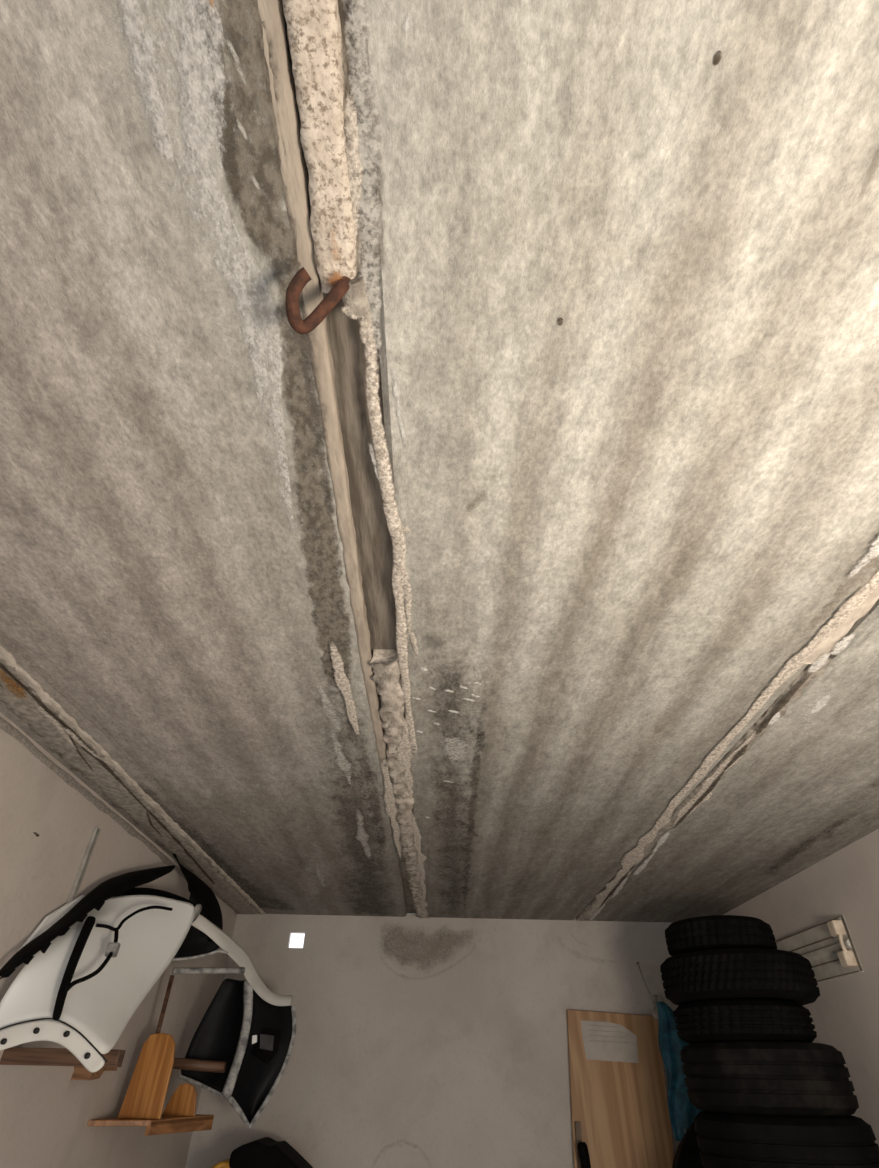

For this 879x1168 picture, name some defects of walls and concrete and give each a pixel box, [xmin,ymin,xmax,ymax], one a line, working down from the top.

peeling [344,94,363,242]
leakage [94,0,392,914]
crack [0,662,214,884]
spalling [330,644,360,735]
peeling [342,267,459,907]
spalling [443,738,469,760]
leakage [434,672,484,913]
spalling [584,536,879,920]